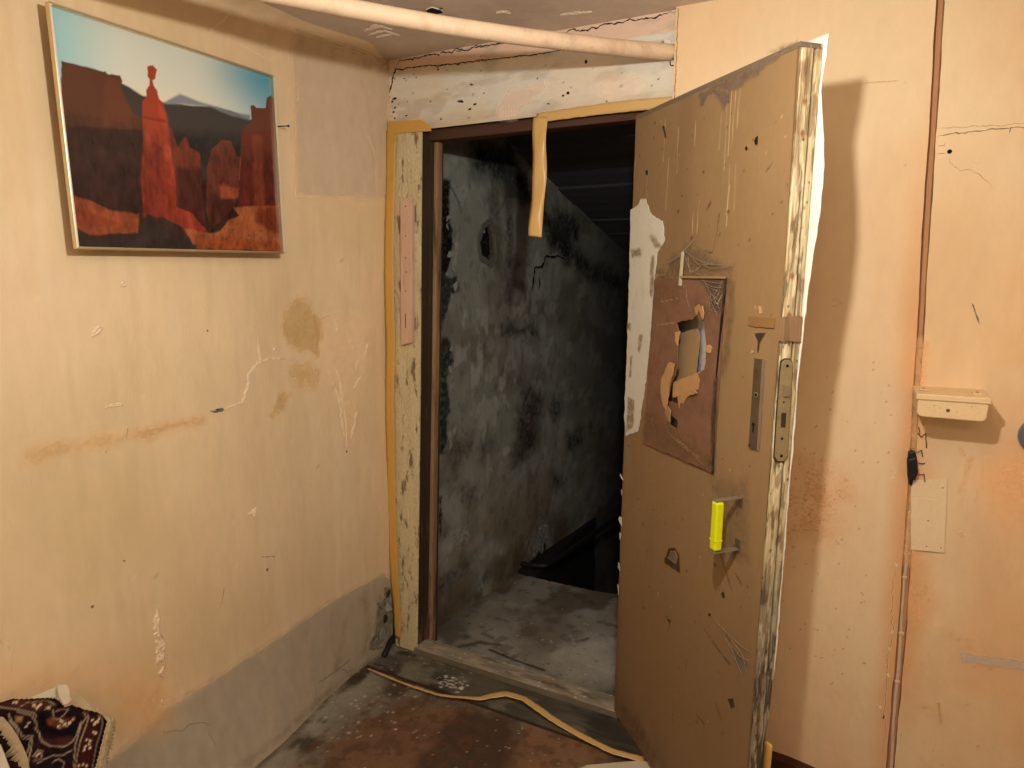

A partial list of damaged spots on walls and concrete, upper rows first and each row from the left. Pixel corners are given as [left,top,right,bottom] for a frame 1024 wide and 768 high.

crack [389,8,679,99]
crack [937,123,1024,187]